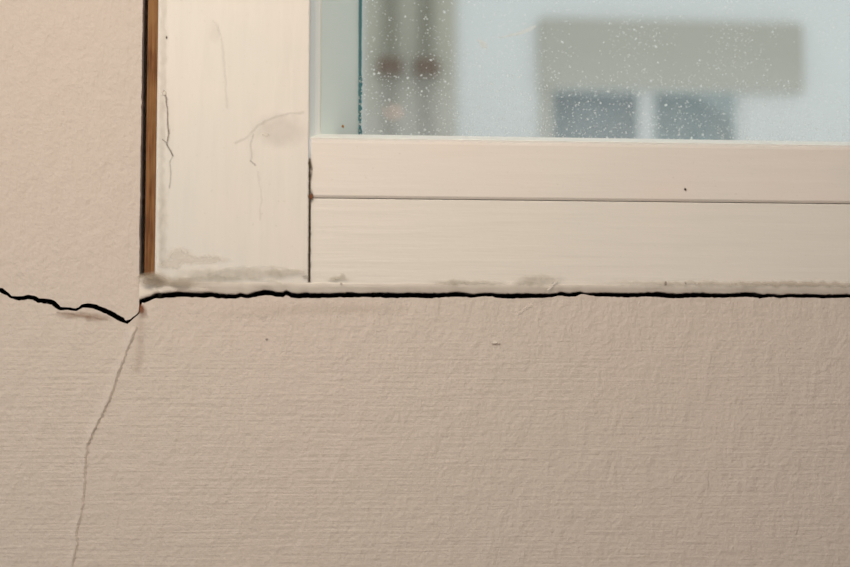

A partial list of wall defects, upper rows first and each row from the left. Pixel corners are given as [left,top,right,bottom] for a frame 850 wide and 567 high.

crack [0,288,850,324]